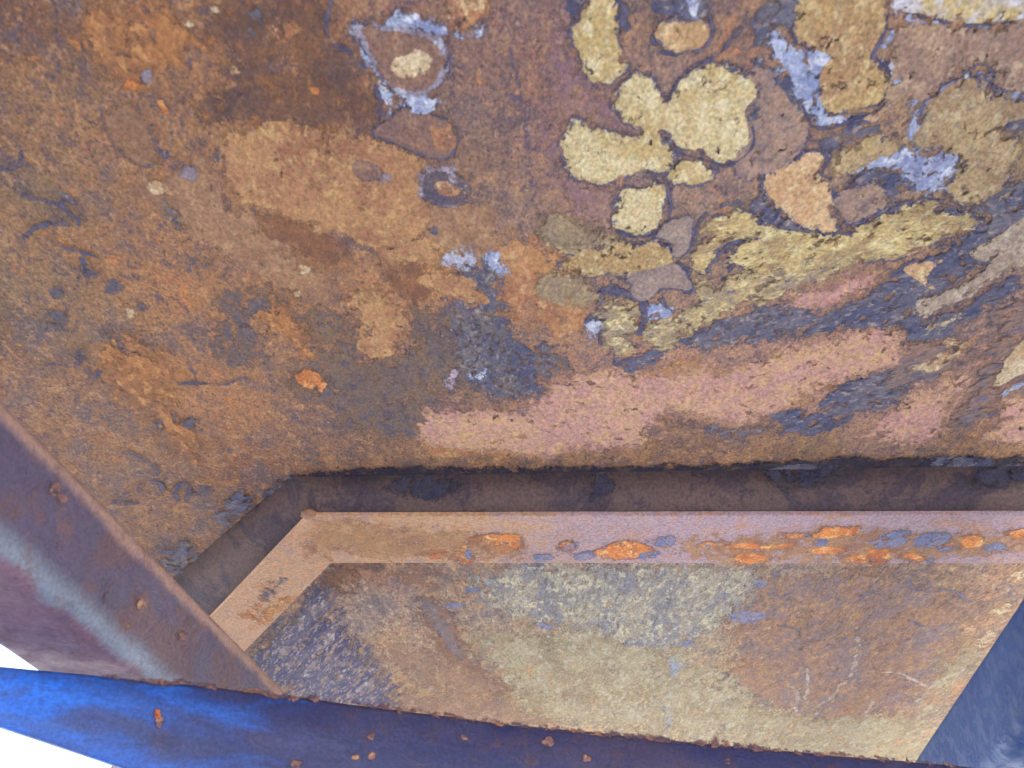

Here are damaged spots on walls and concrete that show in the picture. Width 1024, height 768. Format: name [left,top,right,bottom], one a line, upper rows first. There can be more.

peeling [139,69,153,84]
corrosion [58,0,385,130]
peeling [125,301,149,318]
peeling [146,180,163,196]
peeling [178,166,197,181]
corrosion [117,136,360,402]
corrosion [375,156,591,343]
peeling [204,0,1024,460]
corrosion [84,322,213,467]
corrosion [102,674,332,703]
corrosion [298,516,958,767]
corrosion [592,523,1024,723]